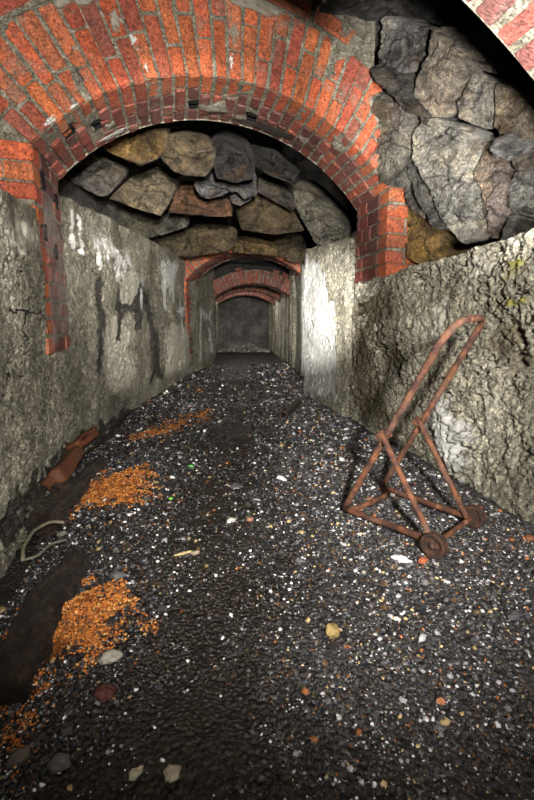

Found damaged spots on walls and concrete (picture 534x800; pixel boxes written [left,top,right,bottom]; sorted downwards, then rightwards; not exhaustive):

crack [8,309,45,340]
damp [68,209,164,385]